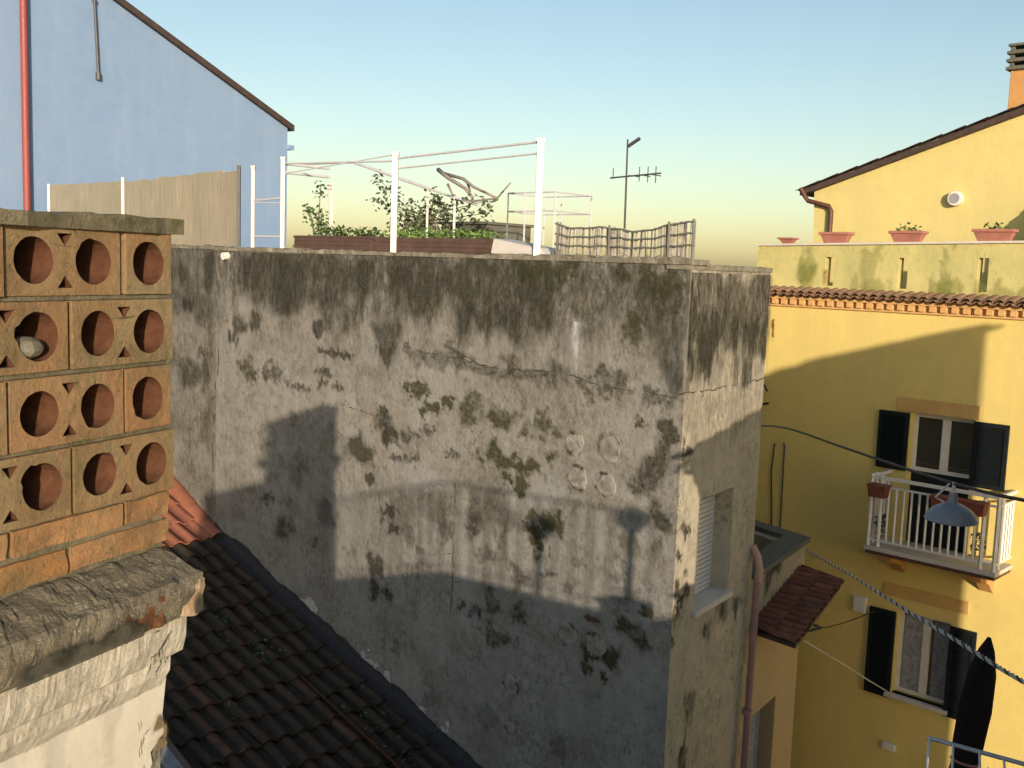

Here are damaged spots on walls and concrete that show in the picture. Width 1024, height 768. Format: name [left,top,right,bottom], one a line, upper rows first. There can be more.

damp [167,252,213,327]
damp [228,253,375,391]
damp [374,256,627,402]
crack [405,346,767,398]
damp [643,272,772,407]
damp [348,433,375,487]
damp [375,405,435,463]
damp [628,419,692,647]
flaking render [180,577,205,616]
damp [366,552,393,601]
damp [16,621,161,691]
flaking render [154,715,167,749]